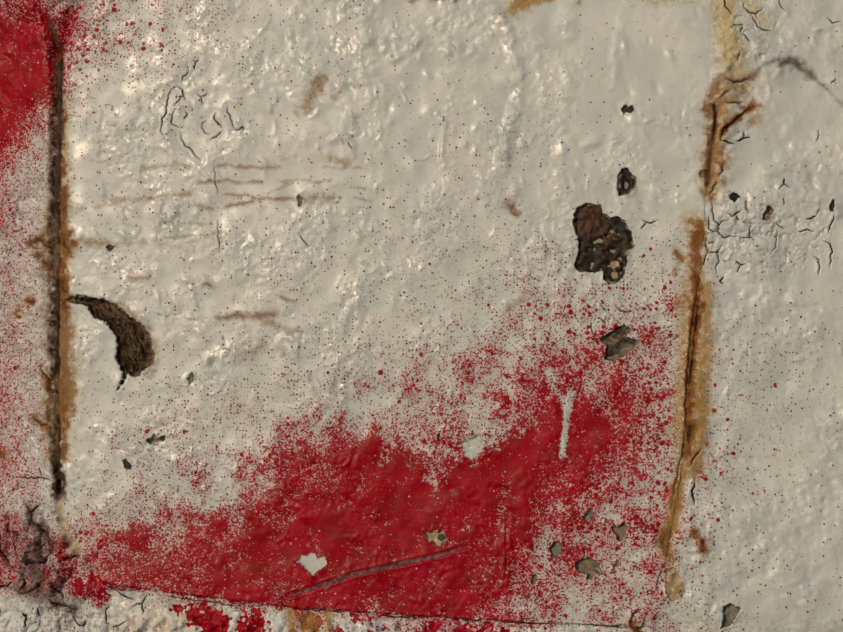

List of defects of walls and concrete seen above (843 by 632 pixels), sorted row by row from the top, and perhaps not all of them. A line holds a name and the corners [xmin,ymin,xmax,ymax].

crack [160,60,243,193]
peeling [614,166,640,198]
corrosion [700,73,761,200]
crack [712,78,752,144]
corrosion [27,25,77,500]
spalling [569,199,639,288]
crack [771,210,834,274]
spalling [60,294,155,390]
peeling [596,322,640,364]
corrosion [673,220,706,458]
crack [671,166,754,507]
corrosion [690,530,708,554]